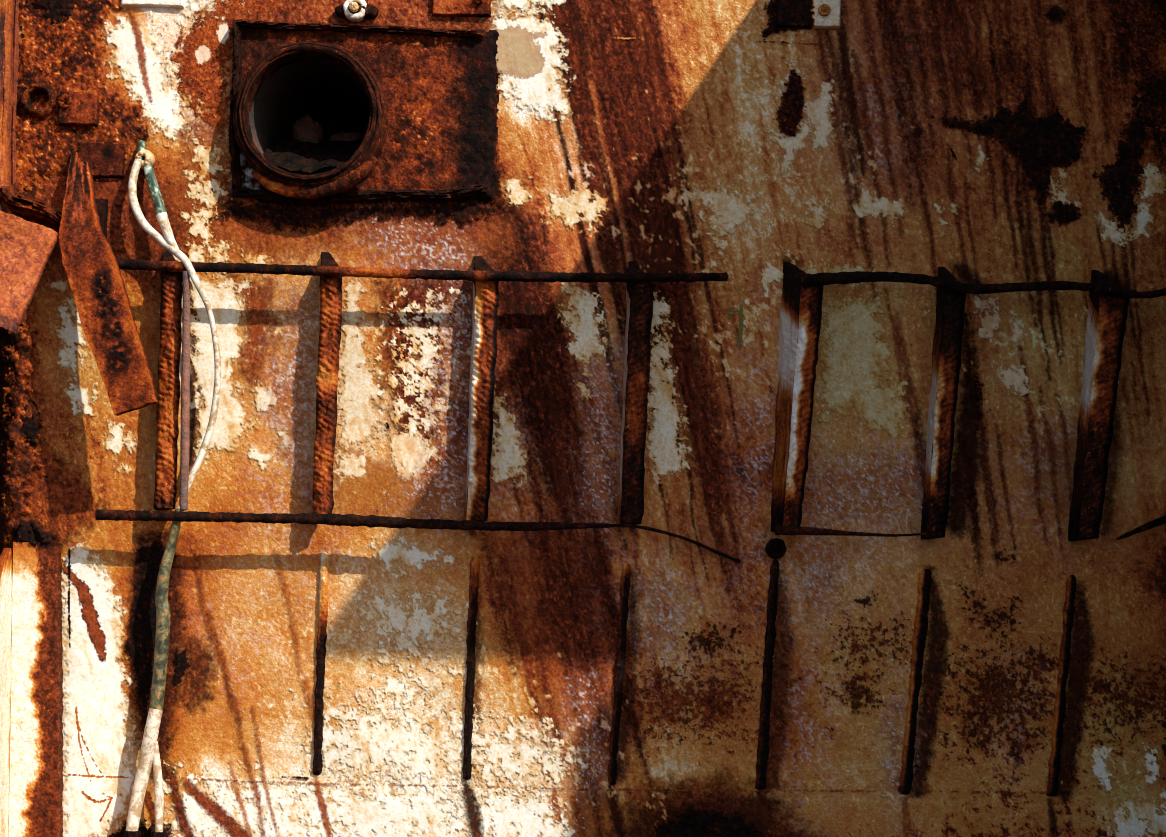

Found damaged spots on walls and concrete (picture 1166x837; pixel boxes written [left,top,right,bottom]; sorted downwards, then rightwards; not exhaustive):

peeling [491,0,576,123]
rust [1031,0,1110,144]
peeling [50,274,137,474]
peeling [101,0,295,470]
peeling [333,278,472,486]
rust [1,0,817,837]
peeling [491,386,533,492]
rust [815,0,1073,567]
rust [1096,218,1150,421]
peeling [61,542,136,837]
rust [902,566,949,837]
rust [1047,582,1095,837]